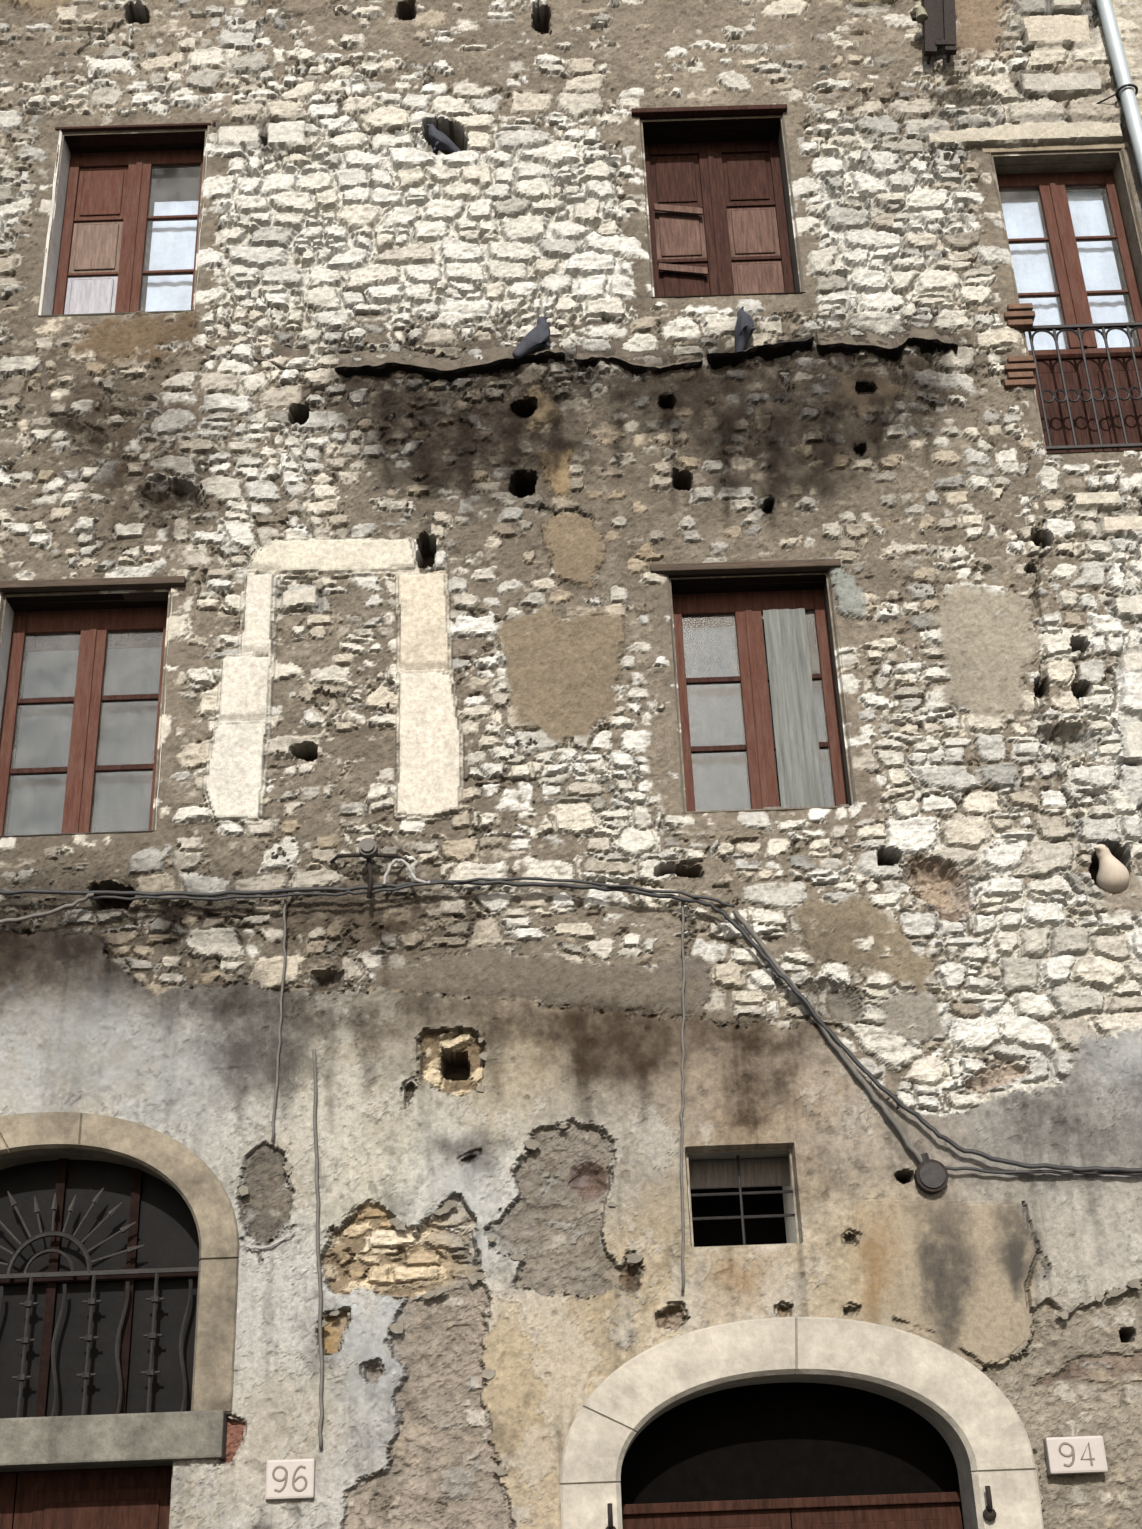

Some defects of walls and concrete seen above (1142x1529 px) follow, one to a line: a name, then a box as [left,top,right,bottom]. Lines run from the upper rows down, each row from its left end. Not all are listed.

damp [330,352,598,494]
damp [617,336,949,514]
flaking render [404,1026,489,1108]
flaking render [238,1141,296,1245]
peeling [316,1119,644,1529]
damp [1003,1217,1029,1290]